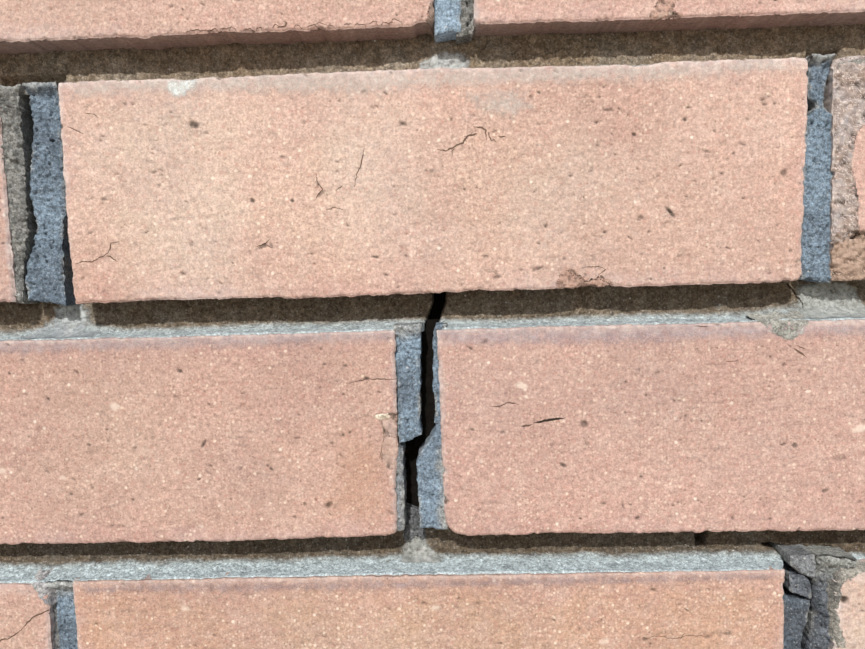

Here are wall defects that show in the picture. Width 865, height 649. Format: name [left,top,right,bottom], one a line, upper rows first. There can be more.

spalling [830,55,865,280]
crack [379,292,446,507]